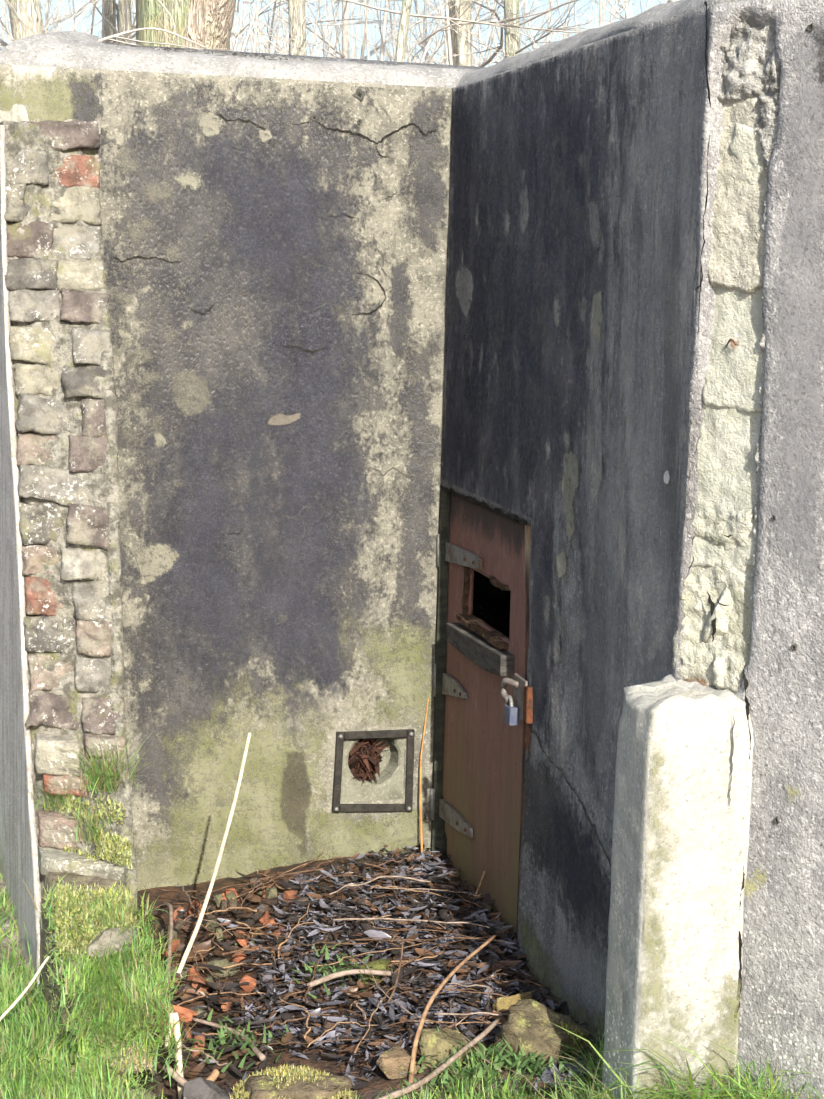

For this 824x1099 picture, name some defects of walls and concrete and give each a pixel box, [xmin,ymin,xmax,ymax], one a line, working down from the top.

crack [216,114,266,154]
crack [294,108,437,157]
crack [696,1,711,332]
spalling [672,18,781,692]
damp [99,37,660,996]
crack [529,726,611,868]
crack [728,668,751,805]
crack [735,931,743,1013]